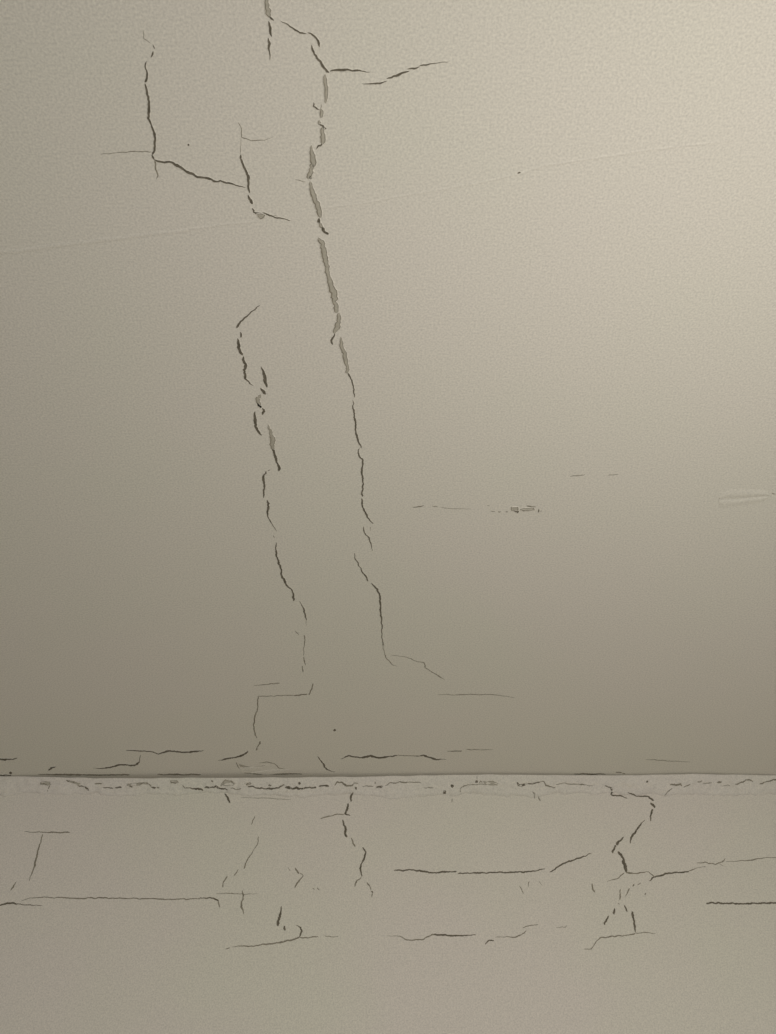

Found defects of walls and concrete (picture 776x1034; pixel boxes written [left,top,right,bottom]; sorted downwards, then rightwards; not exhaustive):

crack [104,32,291,221]
crack [263,0,513,698]
crack [0,305,776,950]